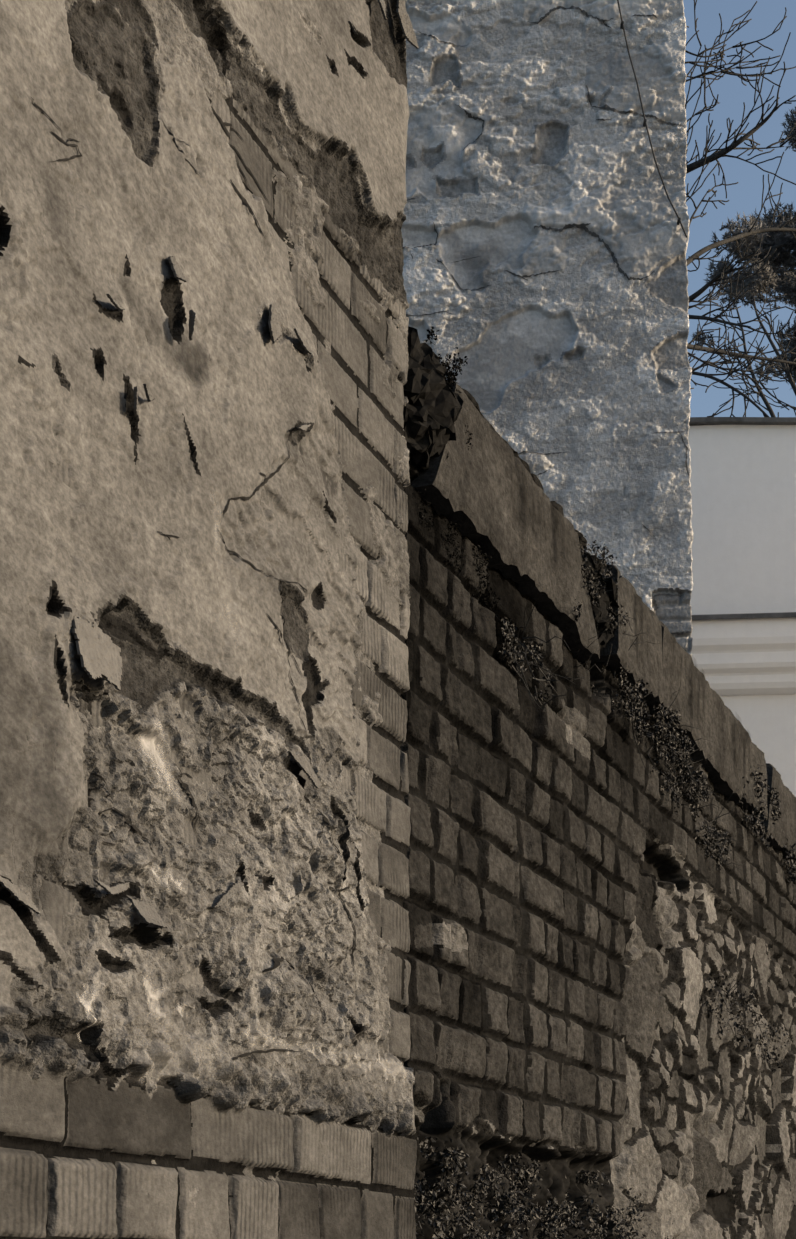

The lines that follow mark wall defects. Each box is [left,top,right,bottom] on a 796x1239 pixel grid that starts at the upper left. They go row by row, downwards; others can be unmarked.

crack [527,6,657,28]
spalling [67,0,161,169]
crack [586,85,685,126]
spalling [171,0,692,413]
crack [534,223,654,280]
flaking render [160,256,196,345]
flaking render [123,374,156,465]
crack [217,441,307,734]
spalling [45,580,330,789]
spalling [68,879,175,950]
flaking render [197,873,275,1022]
spalling [14,1001,152,1093]